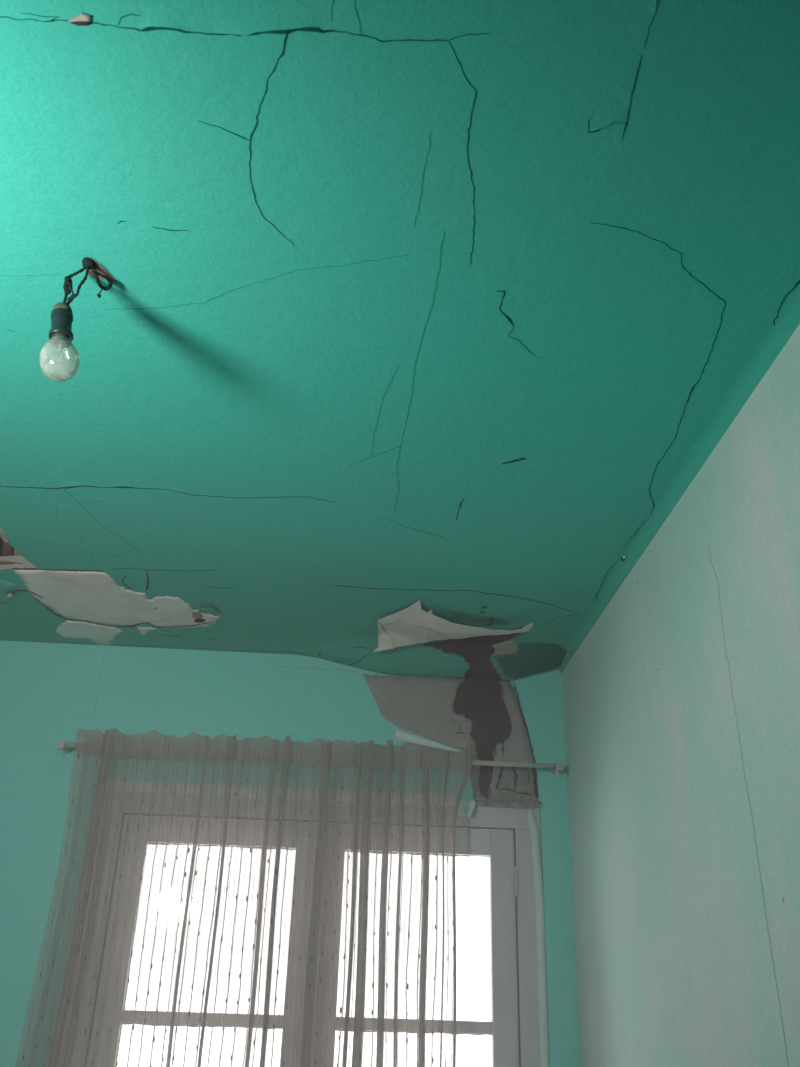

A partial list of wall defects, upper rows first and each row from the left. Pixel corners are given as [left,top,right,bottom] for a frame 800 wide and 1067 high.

crack [0,0,487,266]
crack [588,0,657,140]
crack [104,255,407,310]
crack [773,280,800,326]
crack [339,222,726,624]
crack [0,477,333,592]
spalling [12,568,223,646]
peeling [374,600,533,657]
leakage [423,627,523,799]
crack [708,543,789,1067]